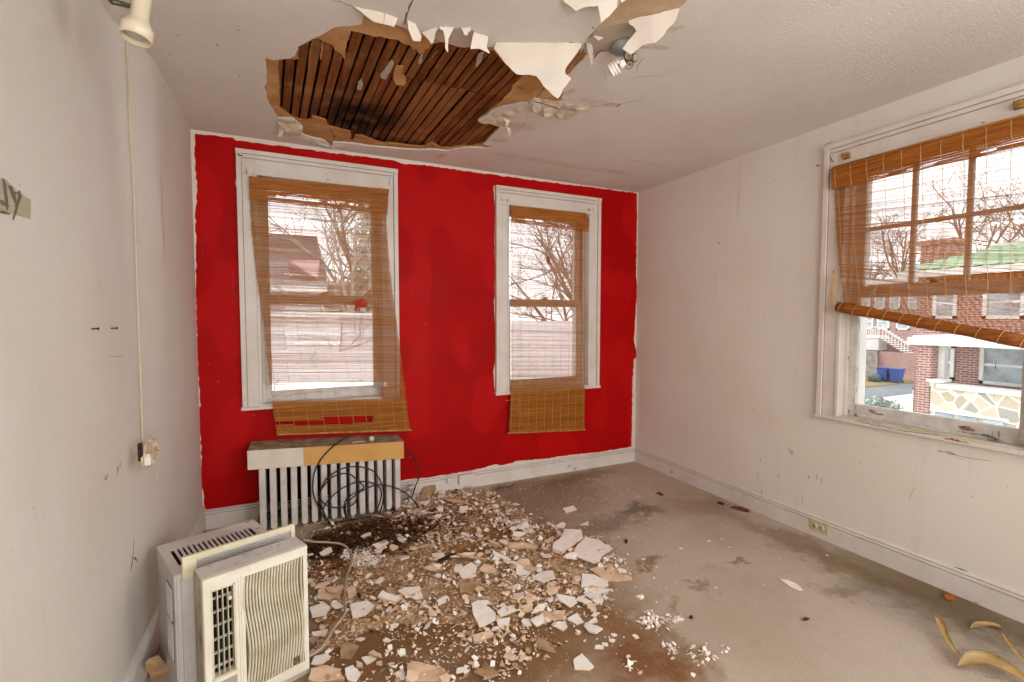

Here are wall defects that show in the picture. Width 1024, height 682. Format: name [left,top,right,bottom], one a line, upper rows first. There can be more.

peeling [278,119,331,148]
peeling [354,0,687,137]